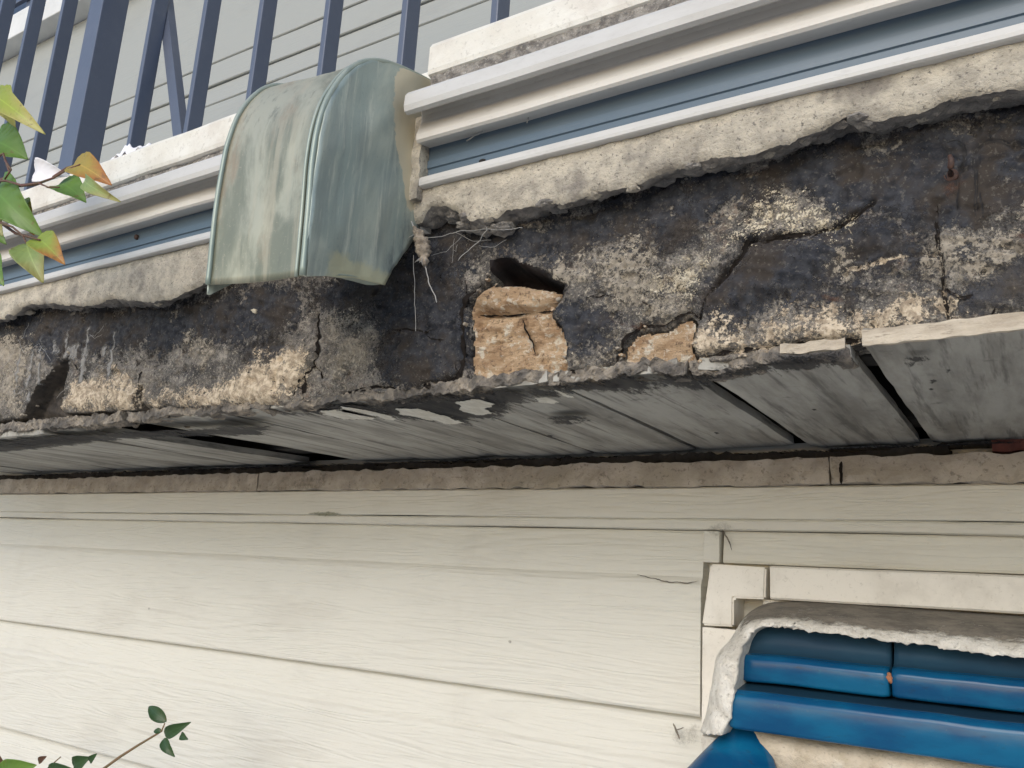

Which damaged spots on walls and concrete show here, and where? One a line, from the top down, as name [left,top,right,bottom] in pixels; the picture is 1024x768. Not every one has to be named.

crack [243,313,323,400]
spalling [0,258,859,436]
leakage [0,105,1024,417]
spalling [417,89,1024,239]
crack [586,205,872,363]
crack [934,130,1023,320]